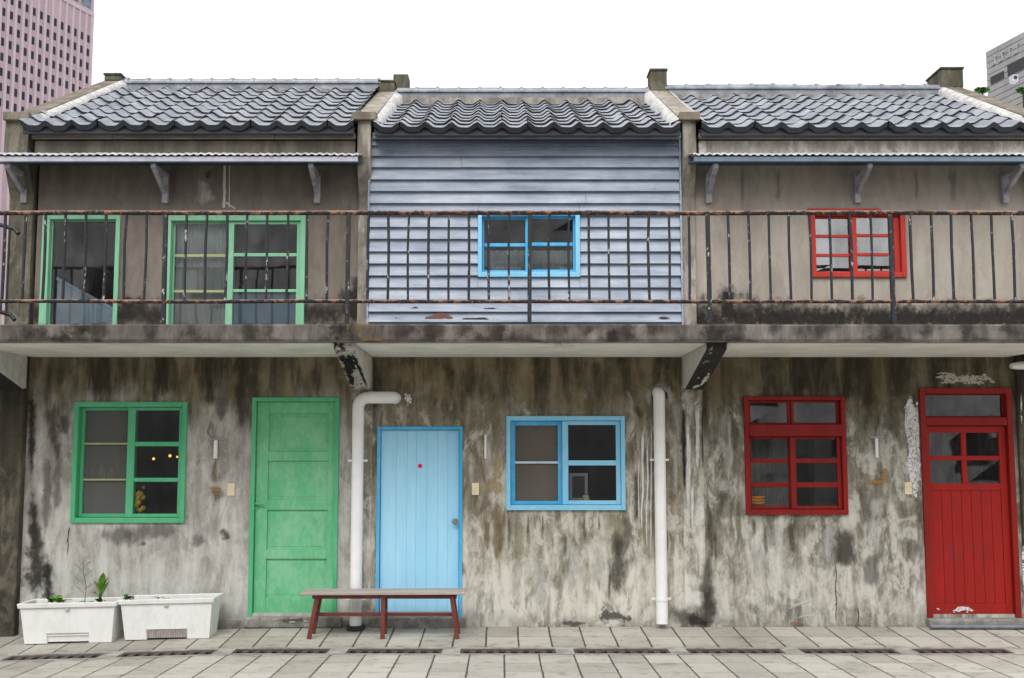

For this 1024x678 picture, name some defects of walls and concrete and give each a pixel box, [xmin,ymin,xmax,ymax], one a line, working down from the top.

leakage [696,286,1024,341]
peeling [338,355,368,388]
leakage [842,357,873,405]
peeling [904,395,921,497]
leakage [25,398,68,598]
leakage [485,508,510,558]
leakage [594,408,652,592]
leakage [674,406,716,627]
leakage [753,522,795,572]
leakage [824,505,885,564]
leakage [865,557,877,583]